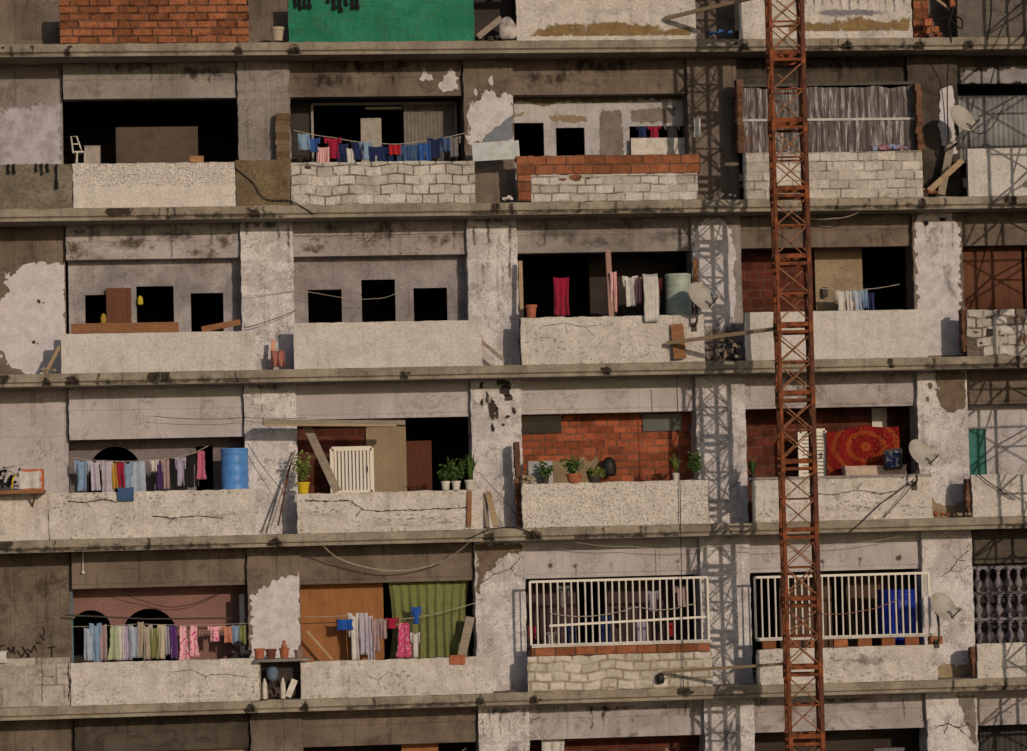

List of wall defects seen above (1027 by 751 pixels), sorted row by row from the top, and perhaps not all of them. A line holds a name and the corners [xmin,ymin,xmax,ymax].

peeling [420,68,459,92]
peeling [465,76,682,155]
peeling [938,67,1027,154]
peeling [692,217,737,331]
peeling [913,198,964,355]
peeling [0,261,79,386]
peeling [926,371,966,413]
crack [68,498,117,508]
crack [153,510,223,525]
crack [809,483,898,501]
peeling [249,573,301,659]
peeling [956,694,977,745]